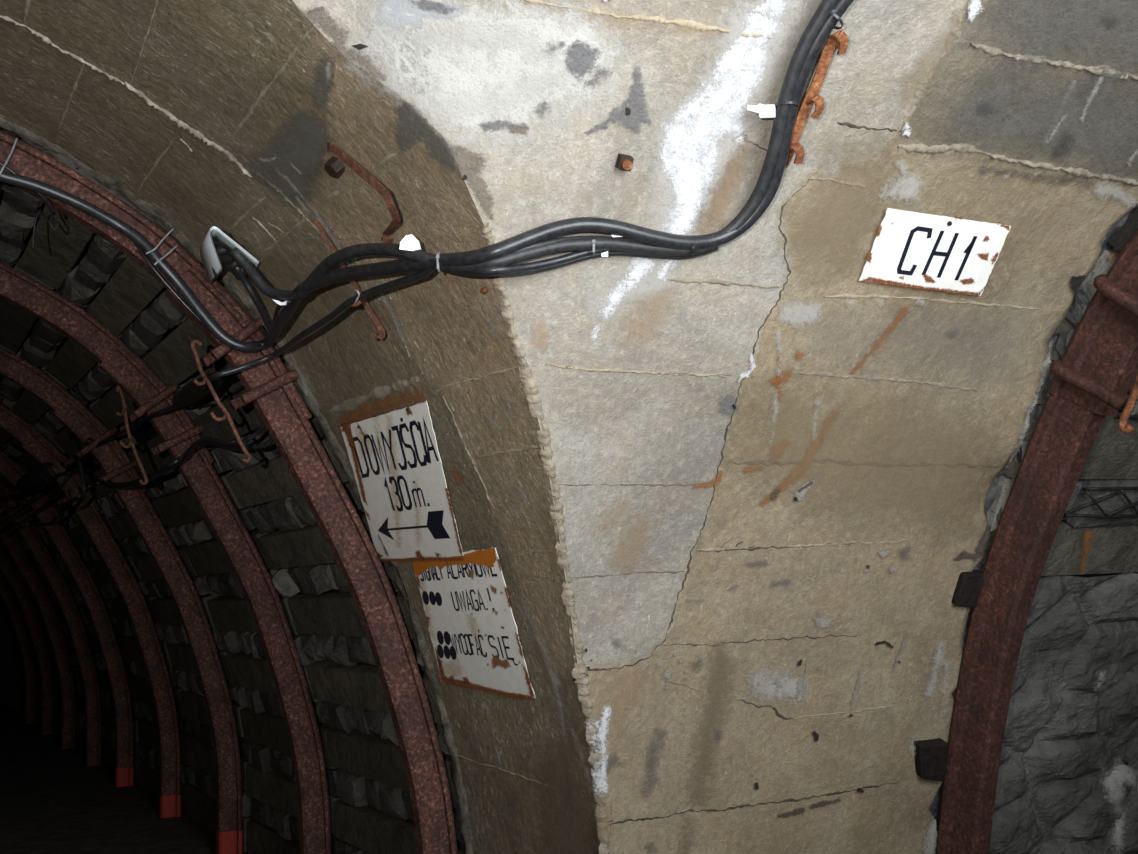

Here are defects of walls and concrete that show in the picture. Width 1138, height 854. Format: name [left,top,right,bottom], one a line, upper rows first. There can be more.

leakage [344,0,635,148]
corrosion [853,306,909,374]
crack [558,179,999,671]
corrosion [759,410,839,505]